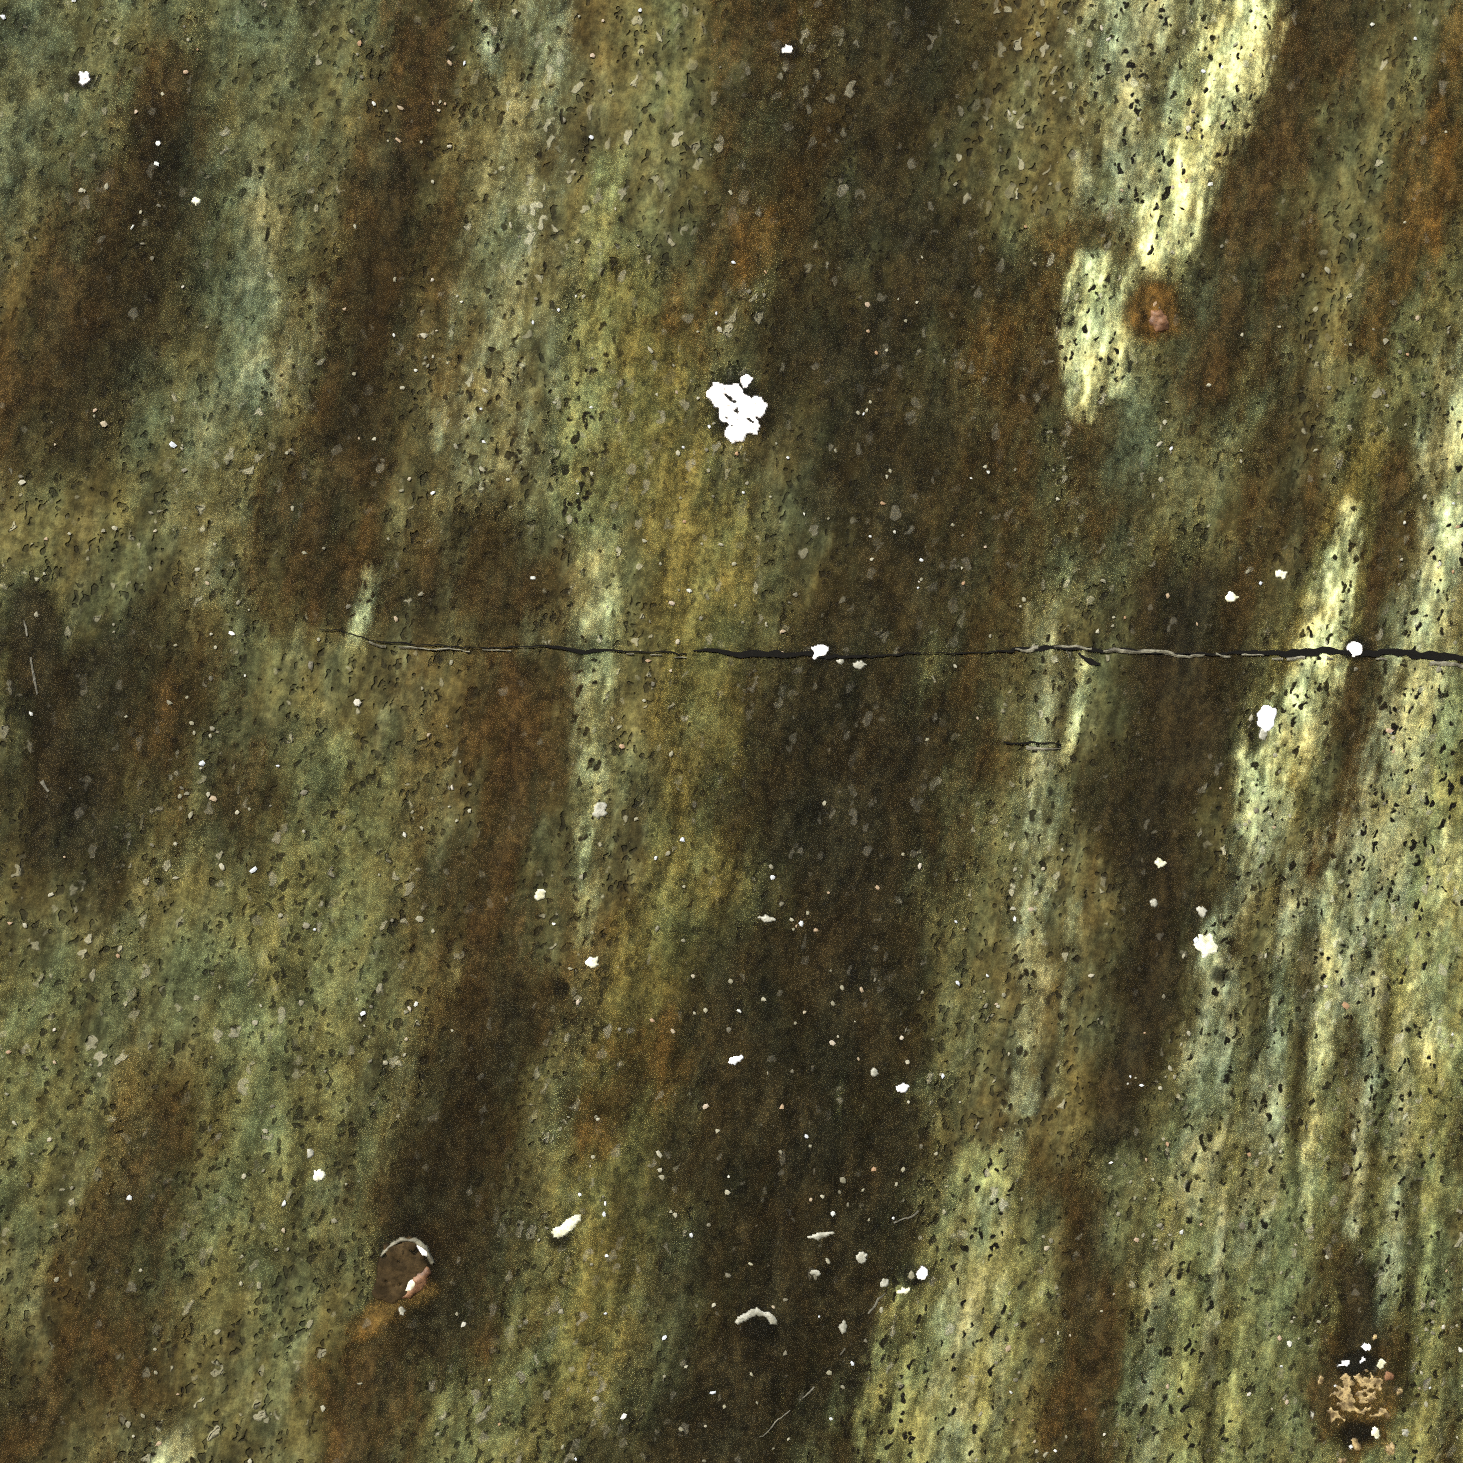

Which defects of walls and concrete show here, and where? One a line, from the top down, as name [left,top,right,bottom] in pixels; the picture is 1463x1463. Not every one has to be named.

water stain [248,0,555,630]
water stain [1058,259,1133,477]
corrosion [1123,277,1179,338]
water stain [1096,0,1378,417]
water stain [299,0,1033,1463]
crack [319,629,1463,669]
water stain [1073,377,1463,1463]
water stain [1037,1165,1129,1463]